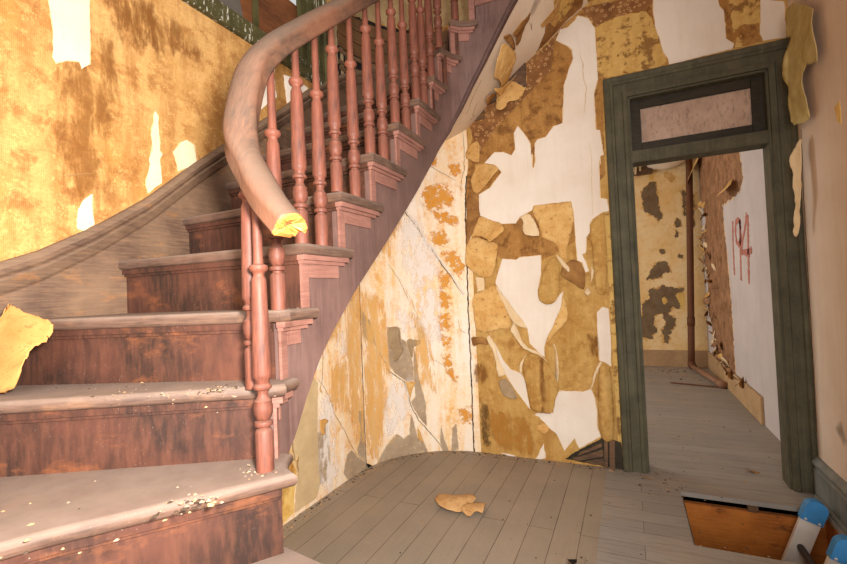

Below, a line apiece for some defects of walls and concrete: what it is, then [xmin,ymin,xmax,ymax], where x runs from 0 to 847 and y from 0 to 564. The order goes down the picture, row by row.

flaking render [48,0,92,69]
spalling [334,0,469,75]
flaking render [652,0,734,65]
flaking render [145,111,163,193]
flaking render [173,140,197,172]
flaking render [76,194,94,231]
crack [431,165,467,242]
flaking render [465,0,614,451]
crack [405,202,475,452]
crack [317,284,443,468]
spalling [293,378,331,513]